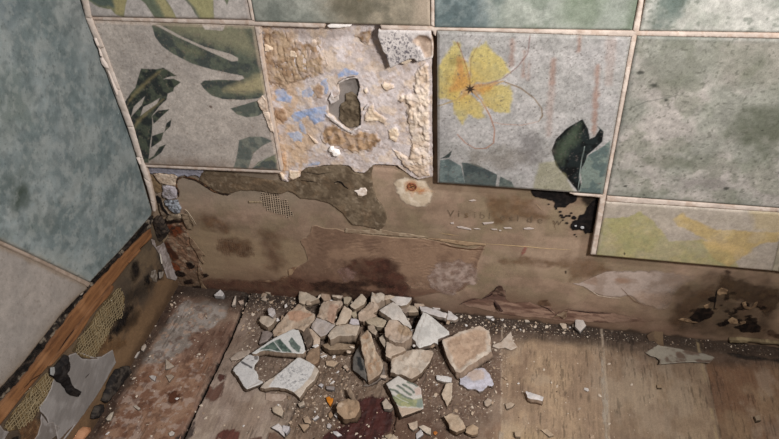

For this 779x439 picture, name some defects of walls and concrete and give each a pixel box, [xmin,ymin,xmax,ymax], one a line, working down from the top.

spalling [136,23,485,298]
leakage [489,189,599,237]
leakage [205,258,477,306]
peeling [573,271,676,309]
leakage [674,271,779,338]
peeling [35,350,116,439]